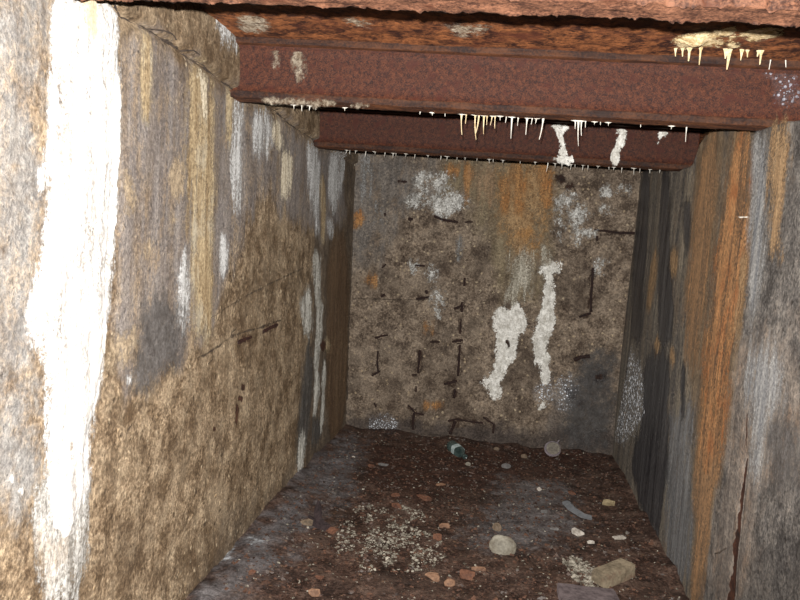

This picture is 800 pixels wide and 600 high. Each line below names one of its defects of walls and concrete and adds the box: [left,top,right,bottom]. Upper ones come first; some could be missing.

efflorescence [675,27,783,50]
efflorescence [407,171,469,218]
corrosion [445,160,555,265]
efflorescence [552,124,574,166]
efflorescence [610,129,627,166]
efflorescence [24,0,122,600]
damp [133,247,190,395]
crack [201,320,281,364]
damp [480,169,695,581]
corrosion [646,251,657,309]
corrosion [669,129,752,600]
crack [715,414,748,600]